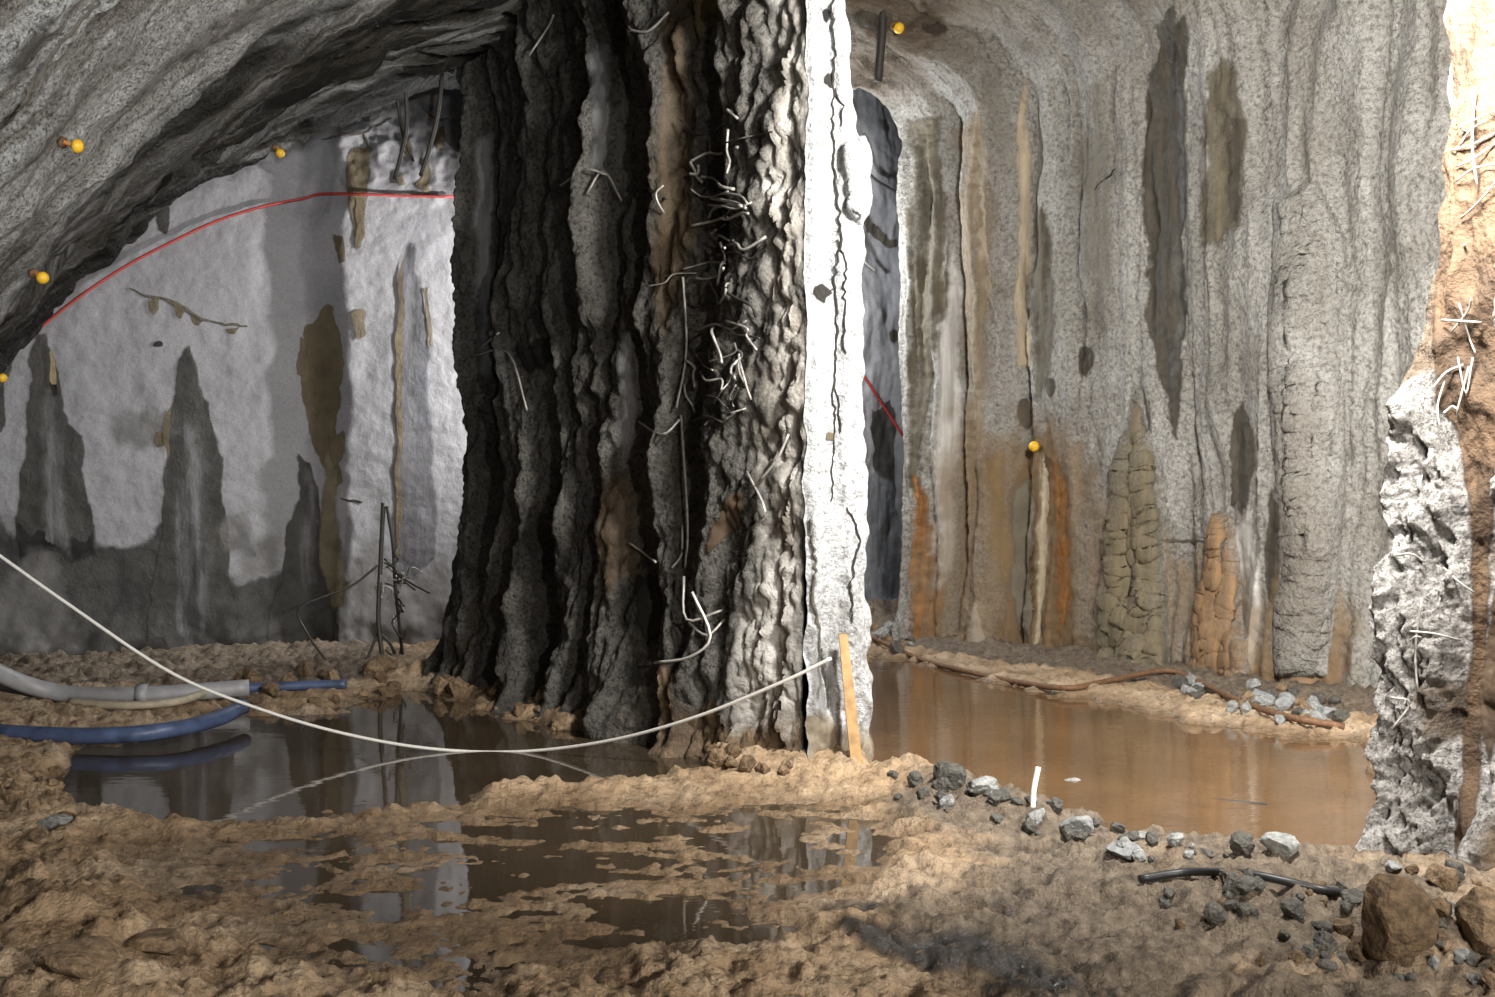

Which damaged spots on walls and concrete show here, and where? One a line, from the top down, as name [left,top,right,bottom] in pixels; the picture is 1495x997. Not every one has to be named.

leakage [0,243,443,656]
crack [809,0,861,707]
corrosion [909,476,945,640]
corrosion [997,428,1092,649]